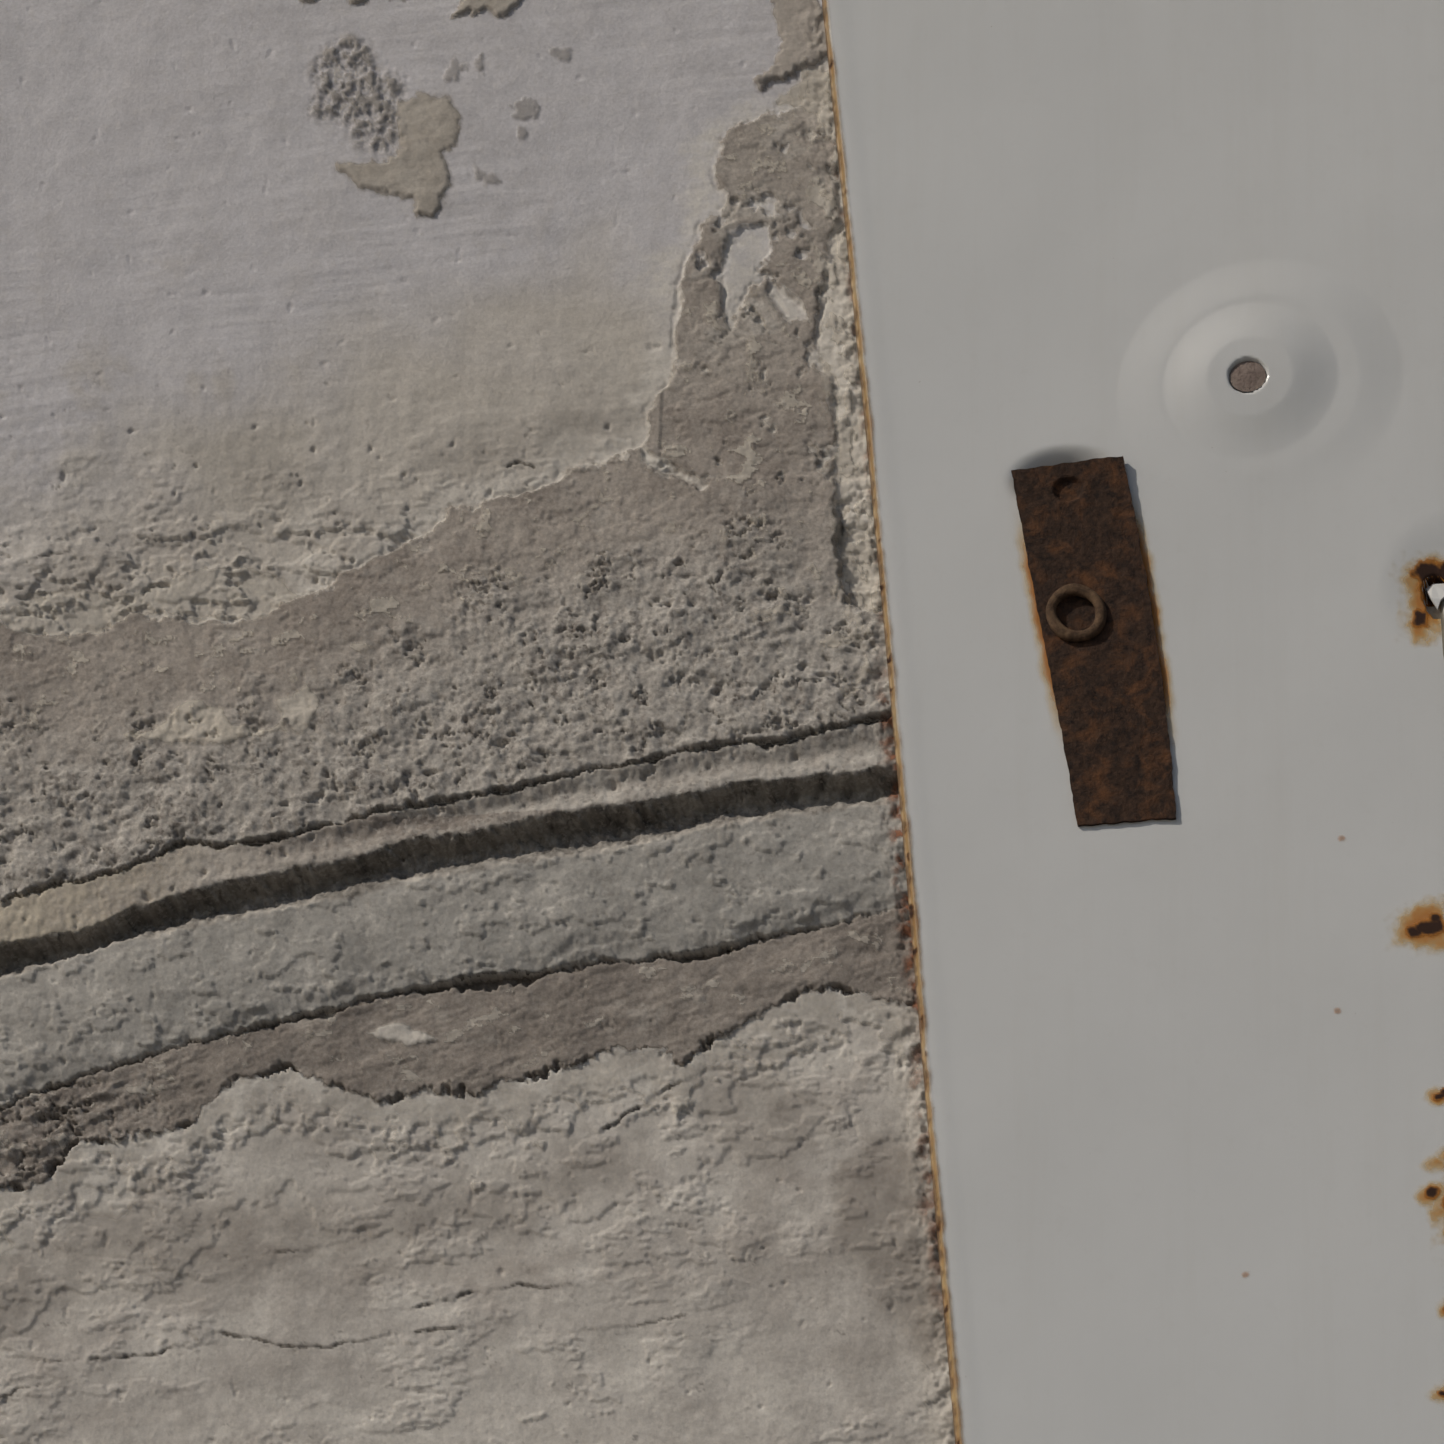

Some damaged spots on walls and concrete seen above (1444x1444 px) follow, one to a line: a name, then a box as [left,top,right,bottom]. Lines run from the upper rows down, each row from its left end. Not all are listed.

spalling [0,0,892,902]
corrosion [1024,547,1055,700]
corrosion [1136,523,1170,712]
corrosion [1404,558,1444,642]
crack [698,720,884,752]
crack [380,781,555,812]
crack [173,839,285,851]
corrosion [1398,904,1444,949]
flaking render [895,1026,921,1057]
spalling [0,907,917,1253]
corrosion [1417,1152,1444,1221]